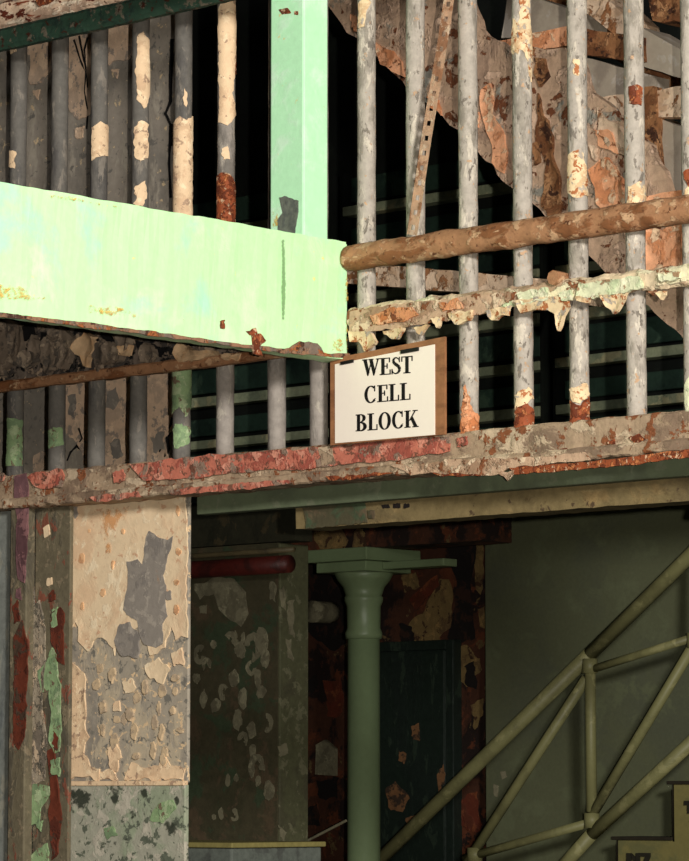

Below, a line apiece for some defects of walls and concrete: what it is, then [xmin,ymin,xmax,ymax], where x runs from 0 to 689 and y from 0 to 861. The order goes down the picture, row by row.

peeling [108,24,150,108]
peeling [133,120,149,162]
peeling [173,88,193,216]
rust [216,172,236,223]
peeling [348,224,683,352]
peeling [0,318,591,483]
rust [460,385,480,434]
rust [514,387,535,428]
rust [569,383,590,424]
rust [509,449,689,474]
peeling [0,382,275,832]
rust [12,600,29,750]